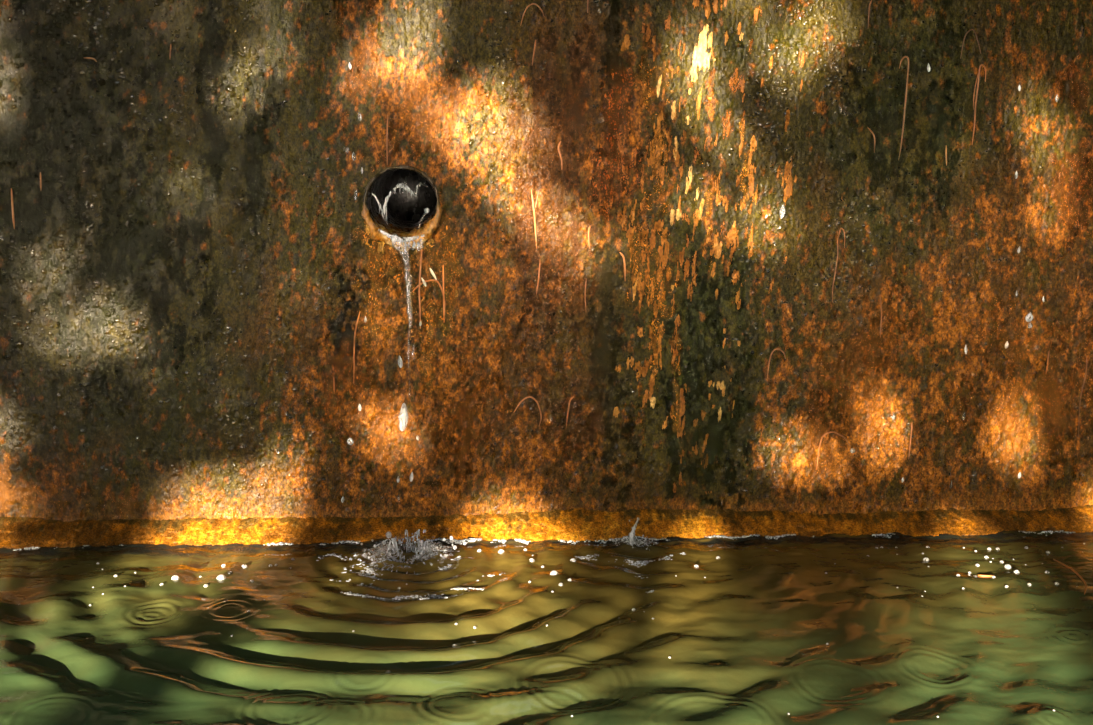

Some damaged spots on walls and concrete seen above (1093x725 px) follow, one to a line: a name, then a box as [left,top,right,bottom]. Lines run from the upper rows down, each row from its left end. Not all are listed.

leakage [191,0,237,241]
leakage [240,57,284,256]
rust [306,216,519,487]
rust [586,40,683,448]
leakage [664,352,753,505]
rust [739,121,750,200]
rust [780,274,916,497]